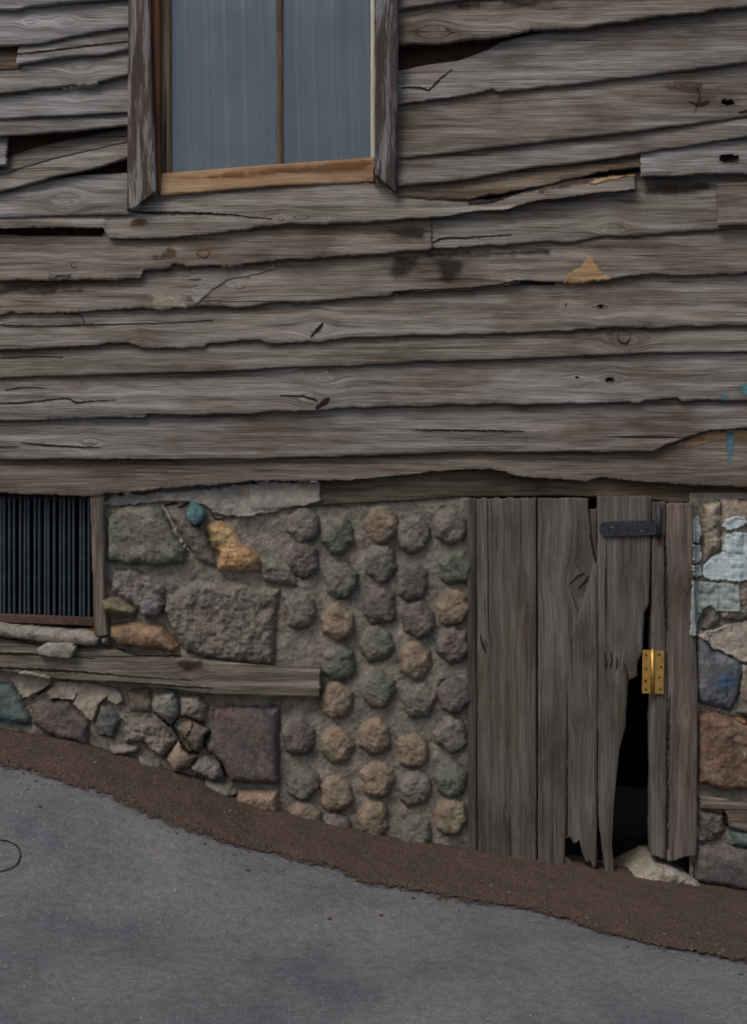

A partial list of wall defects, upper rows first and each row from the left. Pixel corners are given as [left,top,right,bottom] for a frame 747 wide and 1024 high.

crack [402,69,452,91]
crack [132,211,273,219]
crack [432,234,512,244]
damp [428,249,550,280]
peeling [562,257,611,286]
crack [416,426,525,434]